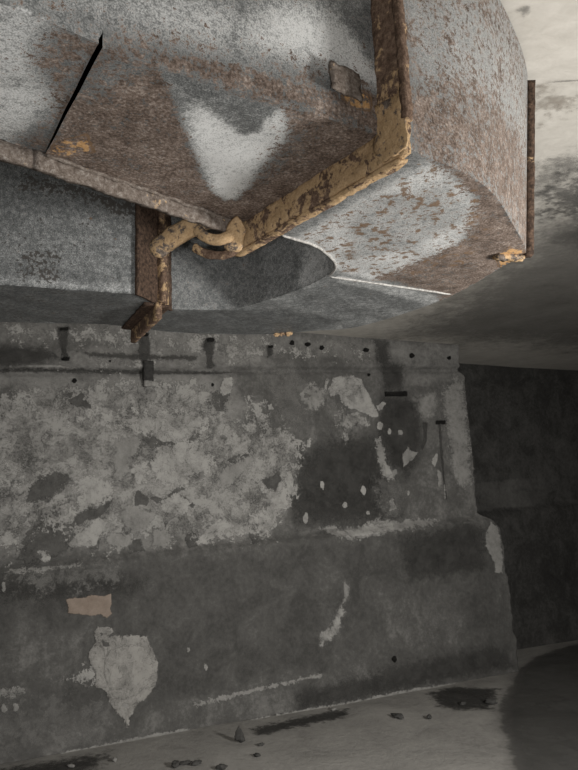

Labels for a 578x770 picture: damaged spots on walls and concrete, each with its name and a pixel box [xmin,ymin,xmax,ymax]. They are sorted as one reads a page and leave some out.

damp [432,228,578,342]
spalling [296,375,440,542]
peeling [411,373,474,489]
peeling [0,322,375,728]
damp [249,649,512,735]